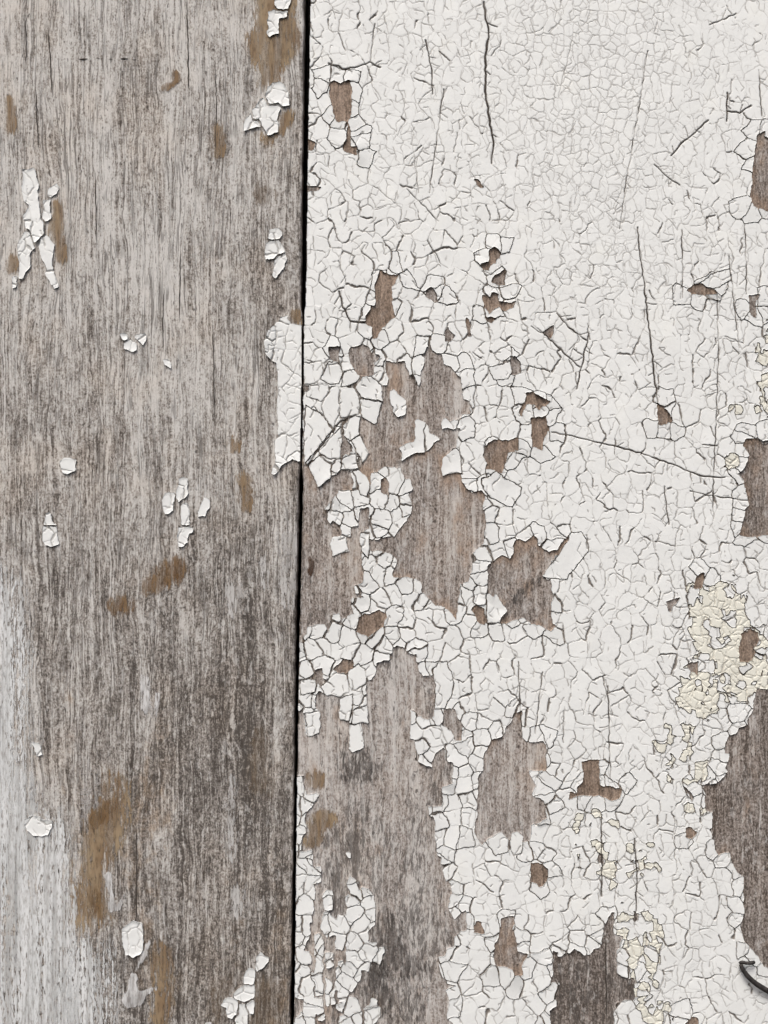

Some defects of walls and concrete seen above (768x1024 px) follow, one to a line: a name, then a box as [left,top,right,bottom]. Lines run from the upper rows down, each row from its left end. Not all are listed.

peeling [244,81,290,136]
crack [484,8,495,164]
crack [657,79,762,185]
peeling [12,168,59,289]
crack [621,56,658,404]
crack [307,415,355,466]
crack [540,314,590,386]
crack [568,225,747,521]
peeling [725,286,768,546]
peeling [264,228,698,1024]
peeling [652,558,768,977]
peeling [221,952,269,1024]